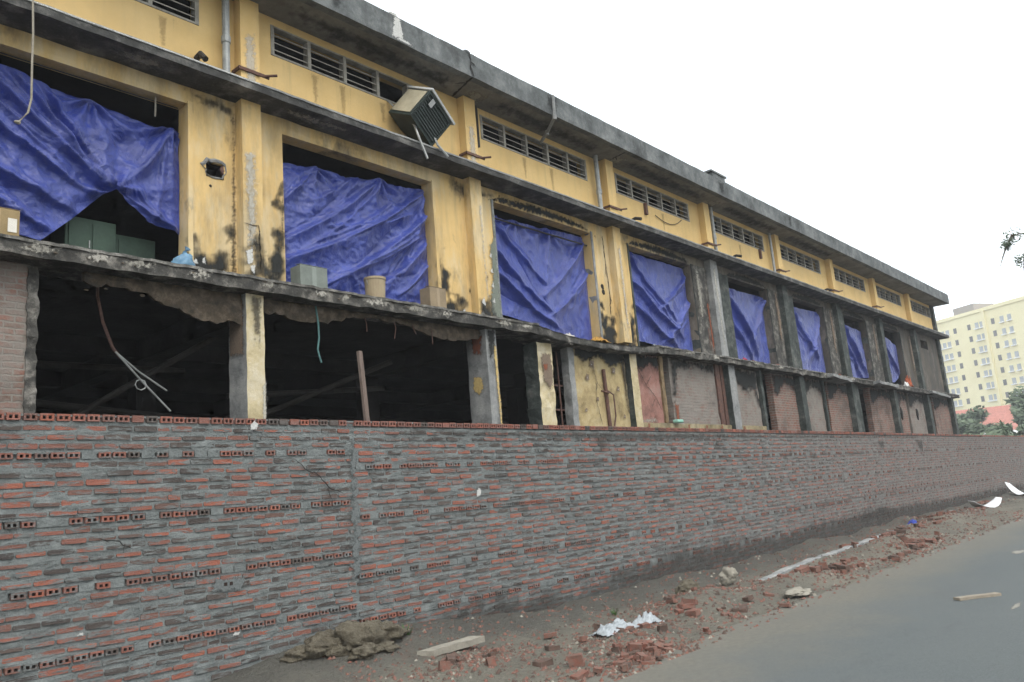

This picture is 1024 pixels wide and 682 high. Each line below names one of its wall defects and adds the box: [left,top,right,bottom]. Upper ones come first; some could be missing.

spalling [21,243,58,254]
spalling [82,253,242,325]
crack [295,459,344,499]